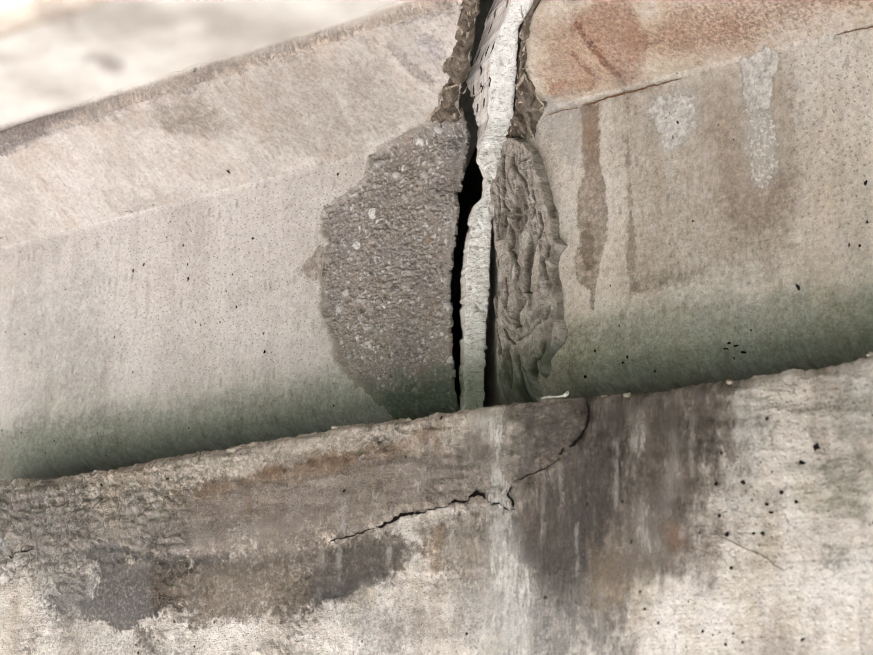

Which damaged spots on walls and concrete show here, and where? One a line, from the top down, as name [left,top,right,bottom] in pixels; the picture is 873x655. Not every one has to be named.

rust [570,1,648,81]
spalling [317,111,471,421]
peeling [489,137,568,405]
water stain [546,99,608,308]
water stain [0,380,742,655]
crack [329,397,590,544]